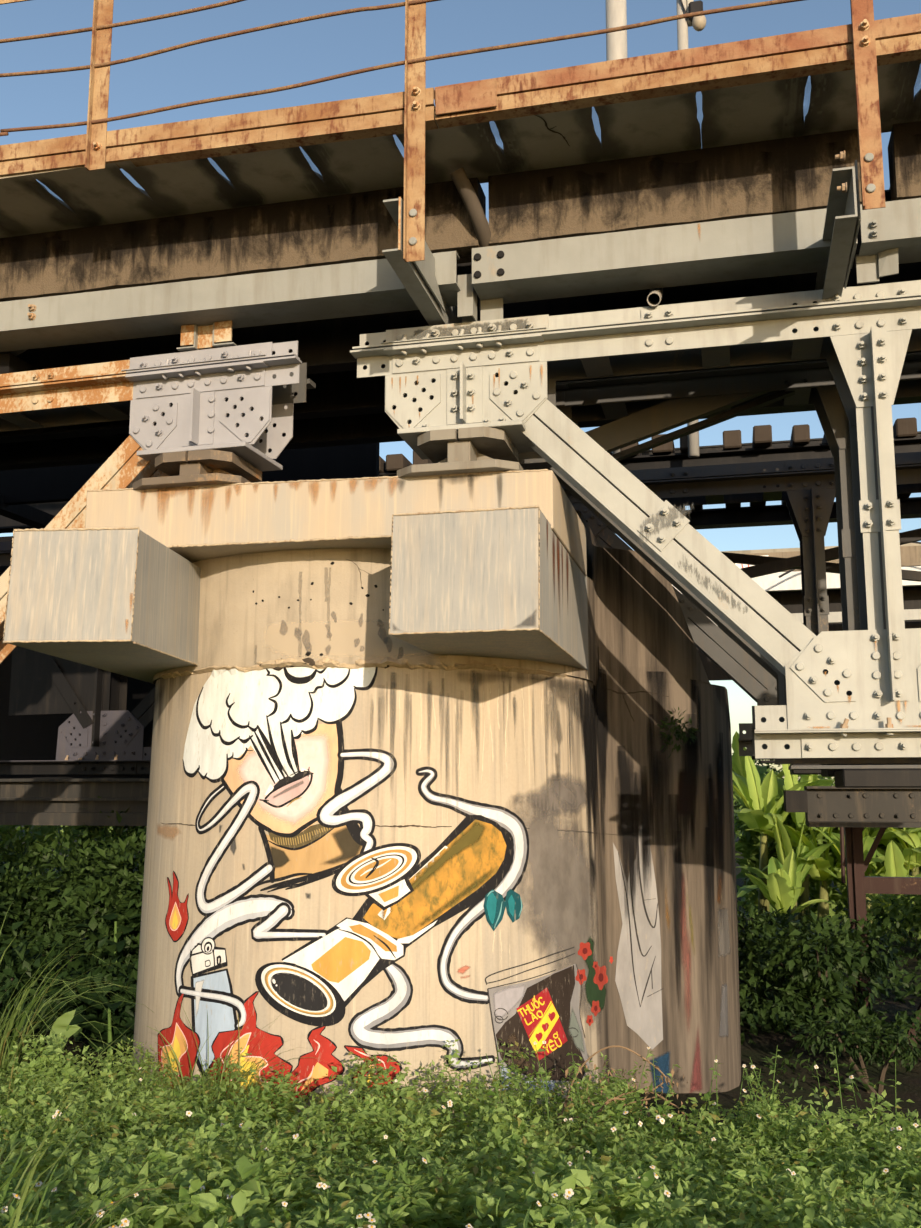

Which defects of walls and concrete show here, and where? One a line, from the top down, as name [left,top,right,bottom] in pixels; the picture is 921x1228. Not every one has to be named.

leakage [379,653,724,1014]